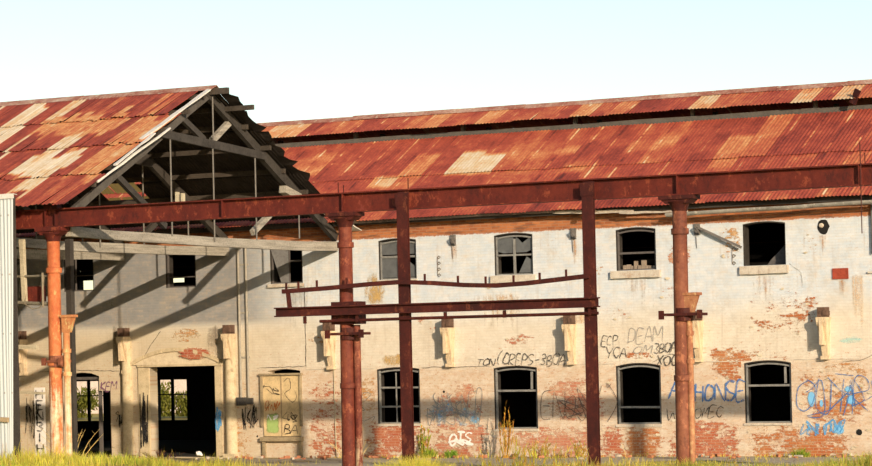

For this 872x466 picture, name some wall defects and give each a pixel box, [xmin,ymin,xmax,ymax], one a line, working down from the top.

spalling [172,328,212,361]
peeling [703,345,793,382]
peeling [750,288,819,335]
peeling [309,381,342,458]
peeling [362,377,402,457]
peeling [414,383,494,457]
peeling [507,378,587,457]
peeling [599,382,676,457]
peeling [695,363,872,457]